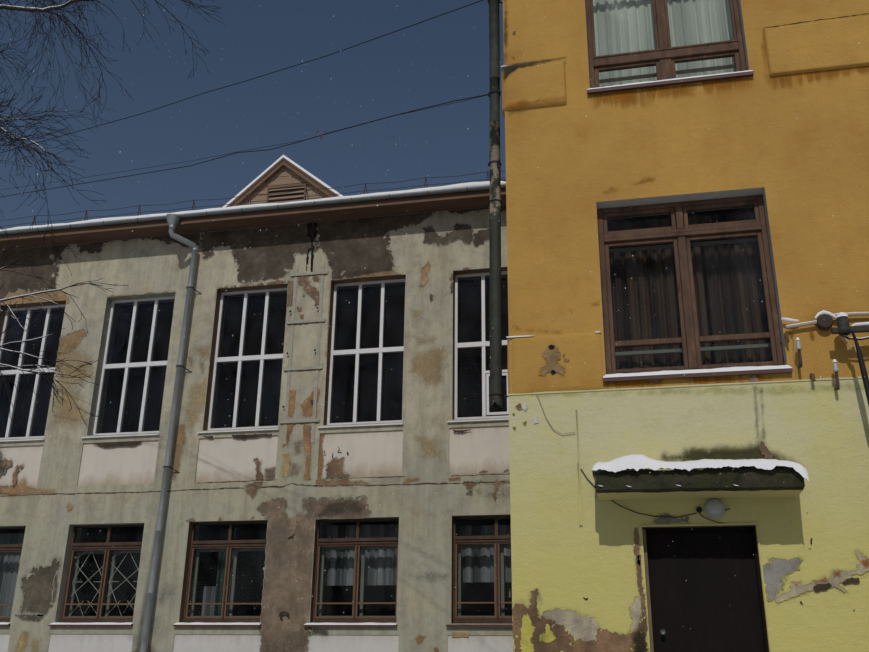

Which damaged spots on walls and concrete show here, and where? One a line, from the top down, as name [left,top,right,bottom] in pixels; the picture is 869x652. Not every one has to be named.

water stain [503,57,565,78]
water stain [306,222,318,272]
peeling [0,207,489,356]
peeling [55,328,88,420]
peeling [282,389,350,480]
peeling [512,402,539,430]
peeling [0,451,24,495]
peeling [462,469,510,502]
peeling [15,556,62,623]
peeling [244,458,372,652]
spalling [512,528,648,652]
peeling [760,538,869,605]